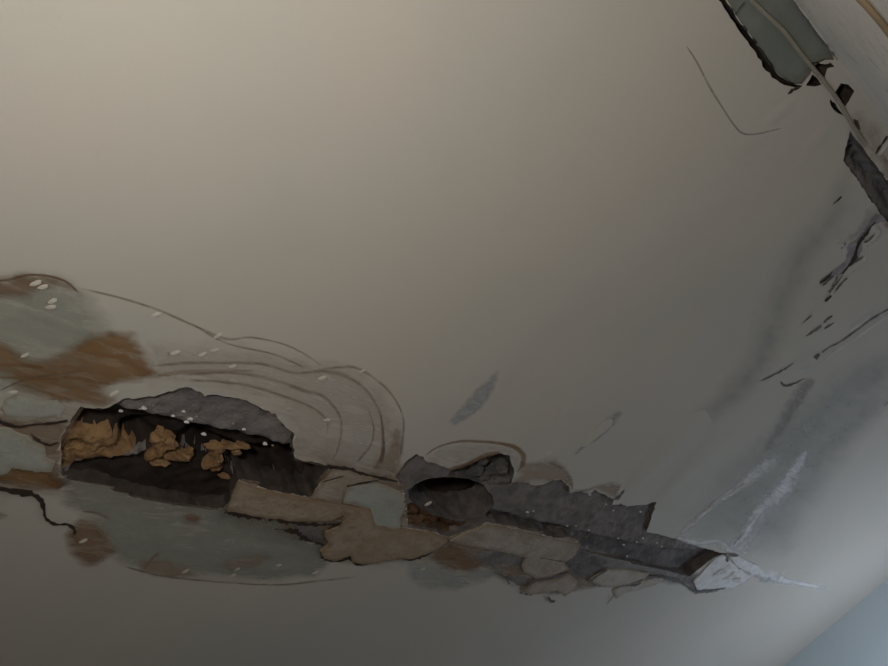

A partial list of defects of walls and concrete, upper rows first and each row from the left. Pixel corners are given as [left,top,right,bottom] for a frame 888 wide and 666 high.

crack [719,0,802,94]
crack [792,0,838,60]
crack [688,49,777,135]
spalling [830,83,854,115]
crack [876,136,888,155]
spalling [820,119,888,302]
crack [0,486,76,535]
spalling [0,387,726,598]